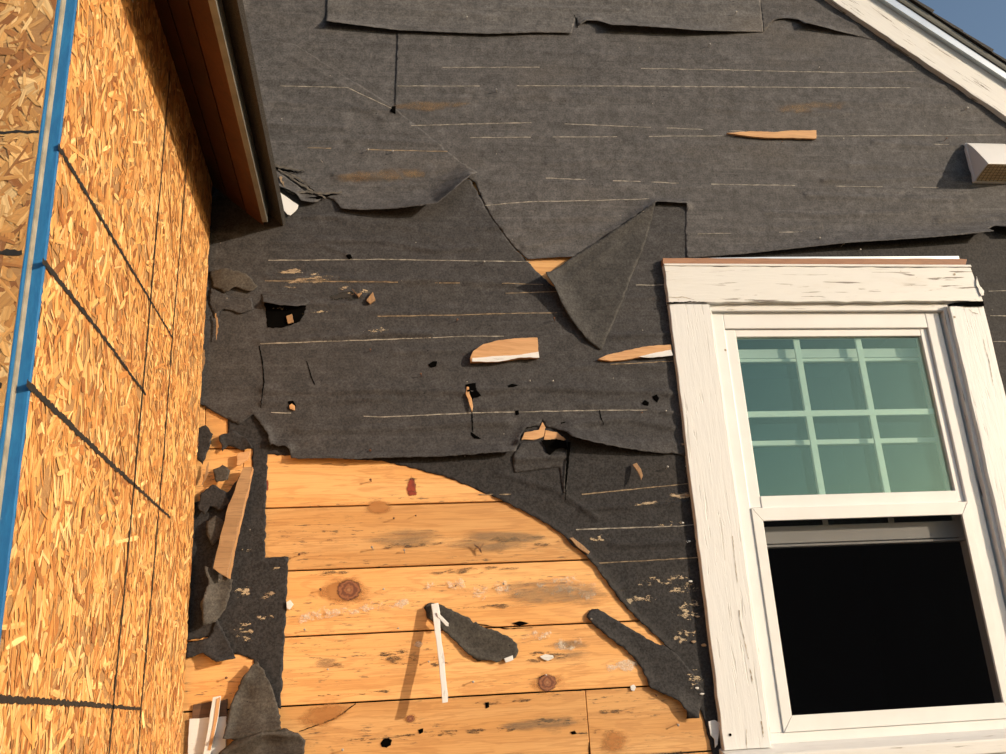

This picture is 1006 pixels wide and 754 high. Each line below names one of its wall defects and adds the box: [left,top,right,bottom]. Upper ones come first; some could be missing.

peeling [282,268,327,288]
peeling [330,286,375,304]
leakage [468,533,547,549]
peeling [626,575,706,647]
peeling [708,720,719,747]